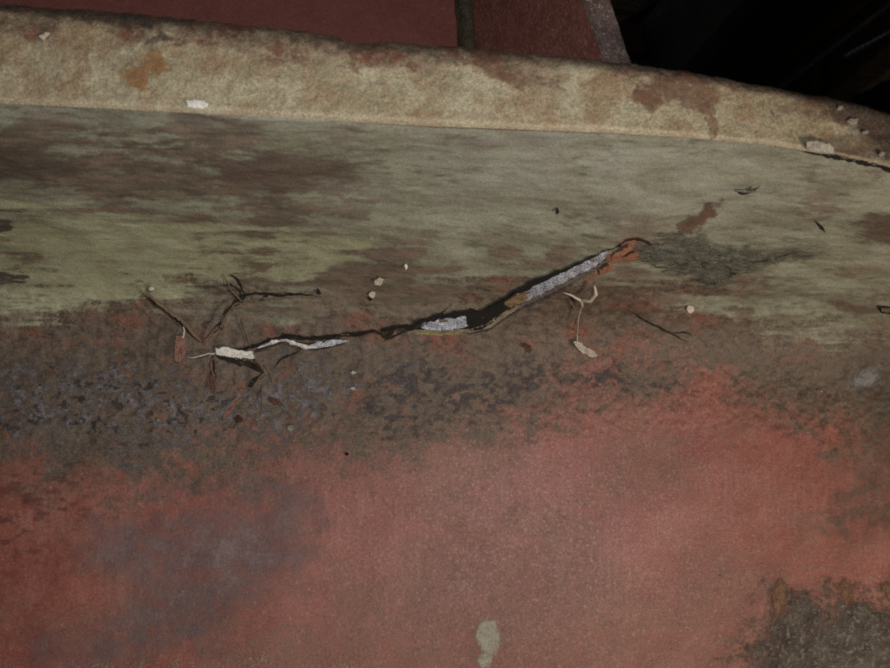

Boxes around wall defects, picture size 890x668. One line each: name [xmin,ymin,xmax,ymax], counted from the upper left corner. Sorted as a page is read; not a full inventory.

water stain [196,152,355,194]
rust [676,199,724,235]
water stain [0,272,29,284]
crack [196,238,652,394]